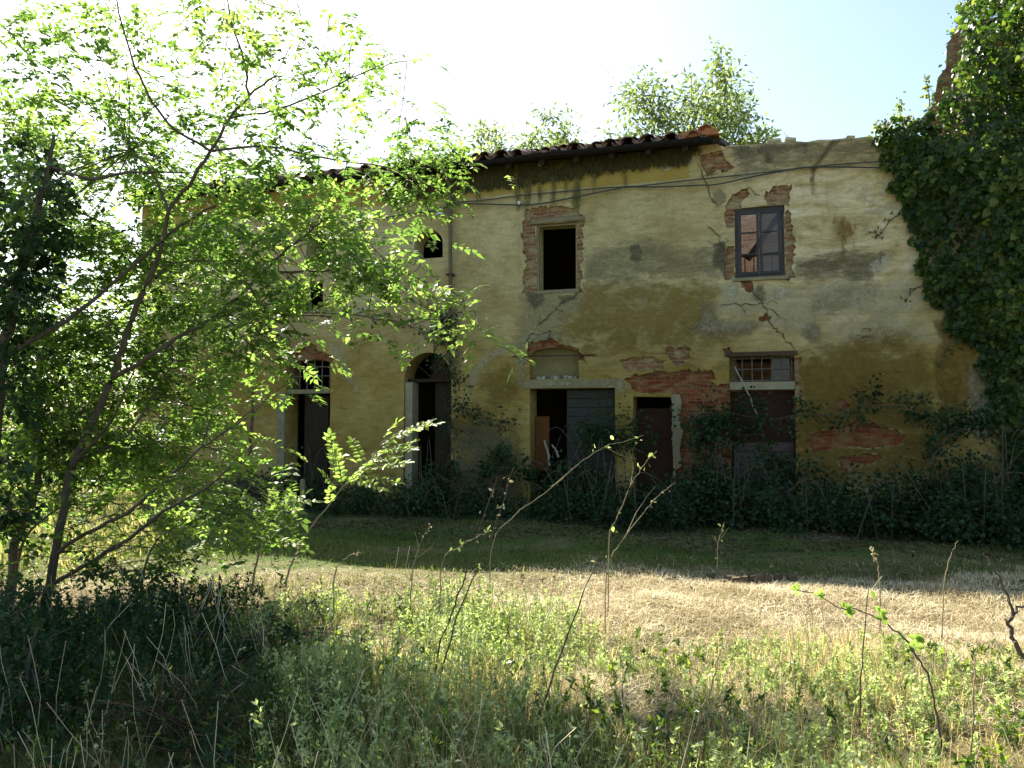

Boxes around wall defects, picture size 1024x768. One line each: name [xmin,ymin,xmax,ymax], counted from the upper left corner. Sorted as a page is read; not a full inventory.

water stain [384,145,702,211]
flaking render [521,206,585,294]
flaking render [659,151,735,177]
flaking render [724,189,750,228]
flaking render [723,246,754,292]
flaking render [764,185,796,282]
flaking render [513,337,586,364]
crack [526,294,577,343]
crack [721,289,796,351]
water stain [796,251,975,486]
flaking render [620,346,731,488]
flaking render [806,420,905,453]